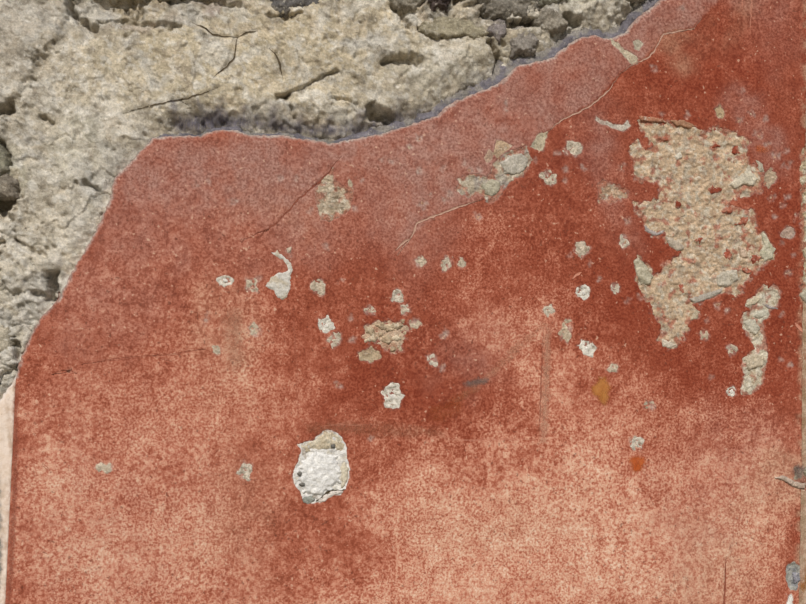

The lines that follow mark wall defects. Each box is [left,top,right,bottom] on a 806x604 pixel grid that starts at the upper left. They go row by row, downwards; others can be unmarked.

crack [127,22,255,113]
crack [546,19,701,134]
flaking render [246,247,293,300]
crack [244,159,339,241]
flaking render [310,279,325,295]
crack [395,199,482,255]
flaking render [455,132,548,204]
flaking render [596,105,780,397]
flaking render [318,315,341,349]
flaking render [358,289,422,363]
flaking render [381,382,405,409]
flaking render [293,430,350,504]